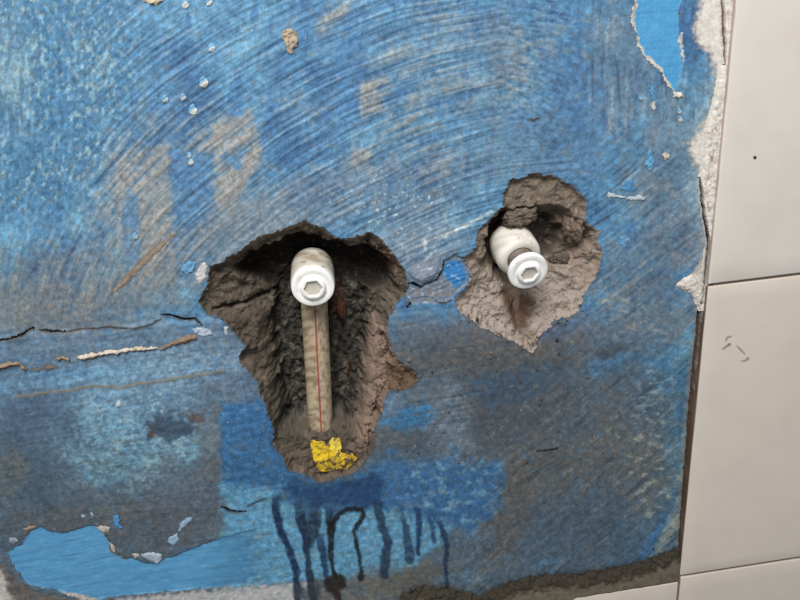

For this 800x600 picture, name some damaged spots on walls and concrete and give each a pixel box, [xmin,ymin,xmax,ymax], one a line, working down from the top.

peeling [630,0,733,239]
crack [0,312,202,344]
spalling [181,172,603,484]
crack [406,262,453,307]
peeling [676,249,711,311]
peeling [0,512,316,600]
leakage [272,500,393,600]
leakage [402,513,449,588]